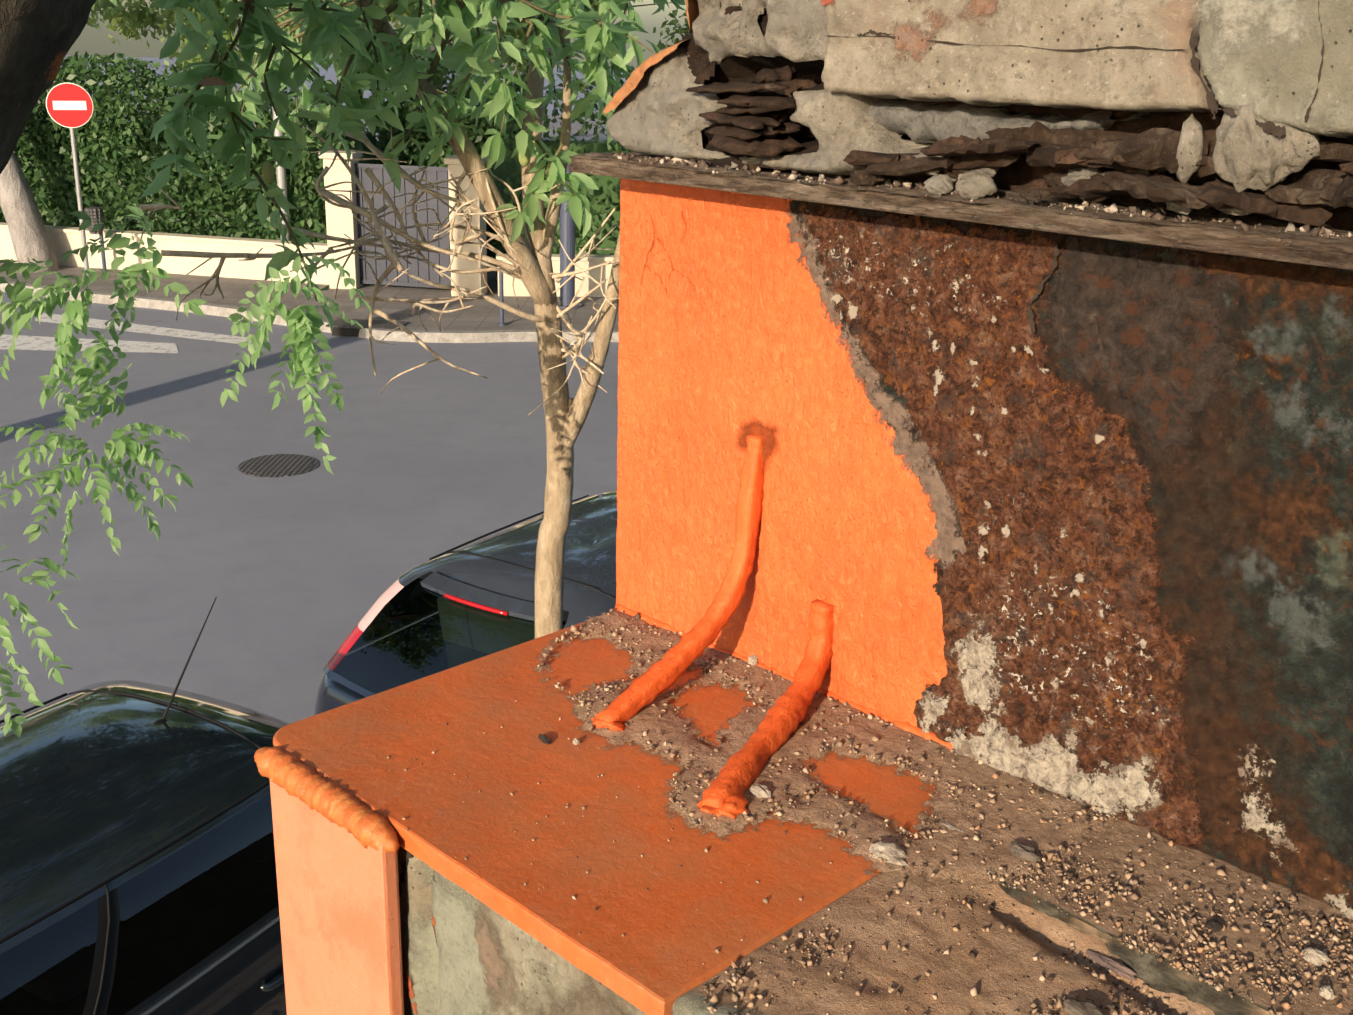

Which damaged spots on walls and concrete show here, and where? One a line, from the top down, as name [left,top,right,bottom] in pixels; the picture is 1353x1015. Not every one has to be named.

spalling [719,2,742,15]
spalling [757,8,768,36]
spalling [676,34,825,170]
crack [828,1,1324,138]
peeling [814,235,952,320]
peeling [951,274,1001,312]
peeling [926,330,955,396]
peeling [978,524,1010,565]
corrosion [798,200,1353,909]
leakage [918,620,1164,821]